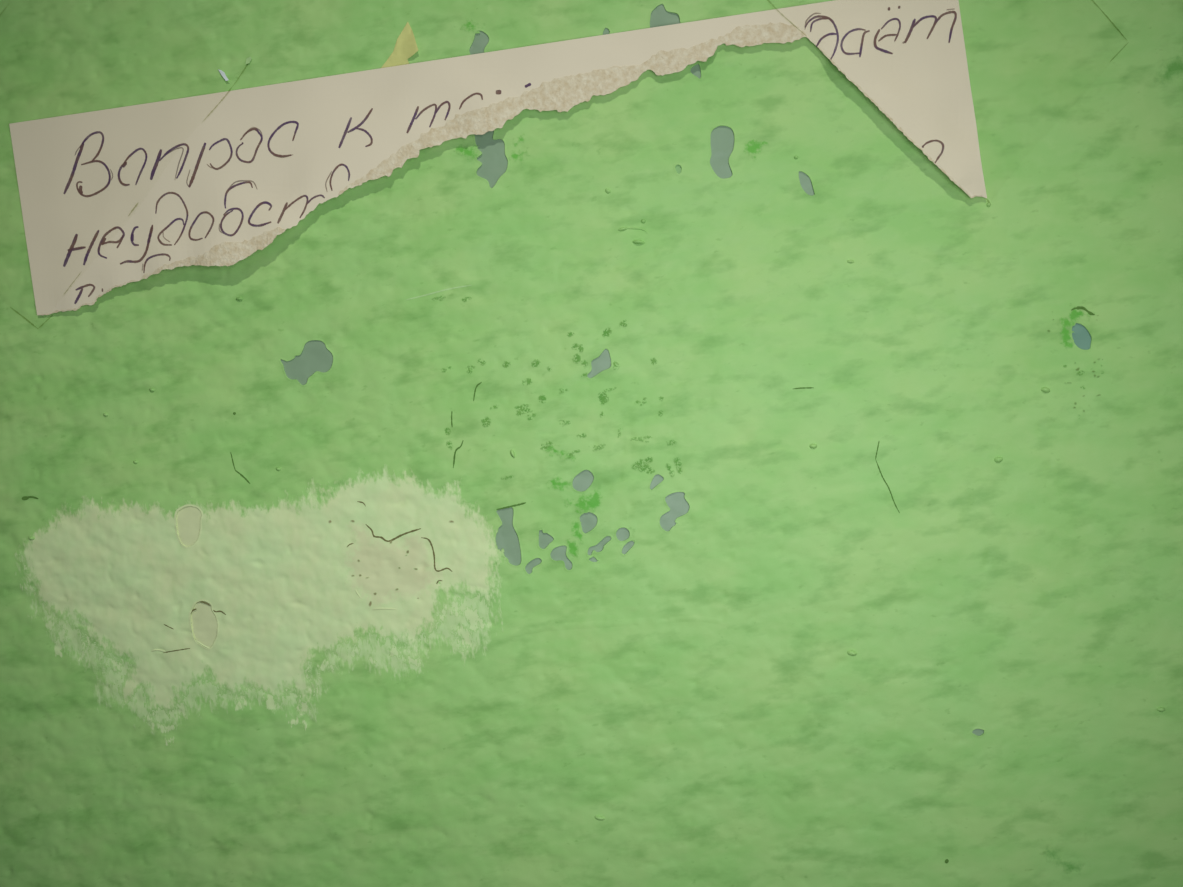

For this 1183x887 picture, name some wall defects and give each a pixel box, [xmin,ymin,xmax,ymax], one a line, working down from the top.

peeling [648,2,683,28]
peeling [472,129,510,190]
peeling [708,124,736,181]
peeling [797,169,817,198]
peeling [1070,321,1094,352]
peeling [277,338,335,387]
peeling [585,347,613,380]
peeling [648,472,691,533]
peeling [12,463,636,746]